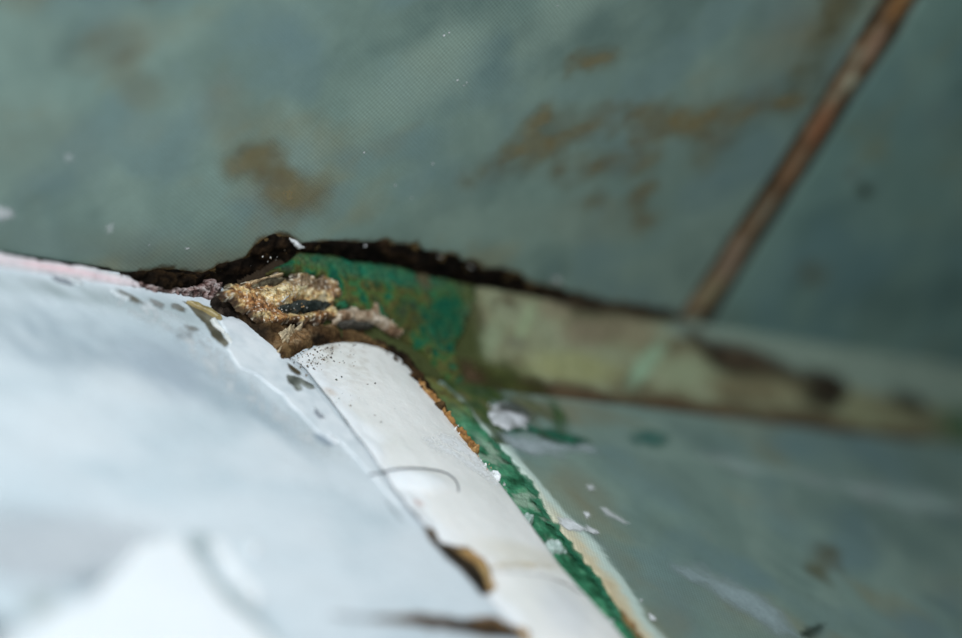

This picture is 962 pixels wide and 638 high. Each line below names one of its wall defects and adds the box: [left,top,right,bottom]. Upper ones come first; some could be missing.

crack [288,363,362,441]
spalling [119,234,670,507]
crack [336,467,530,638]